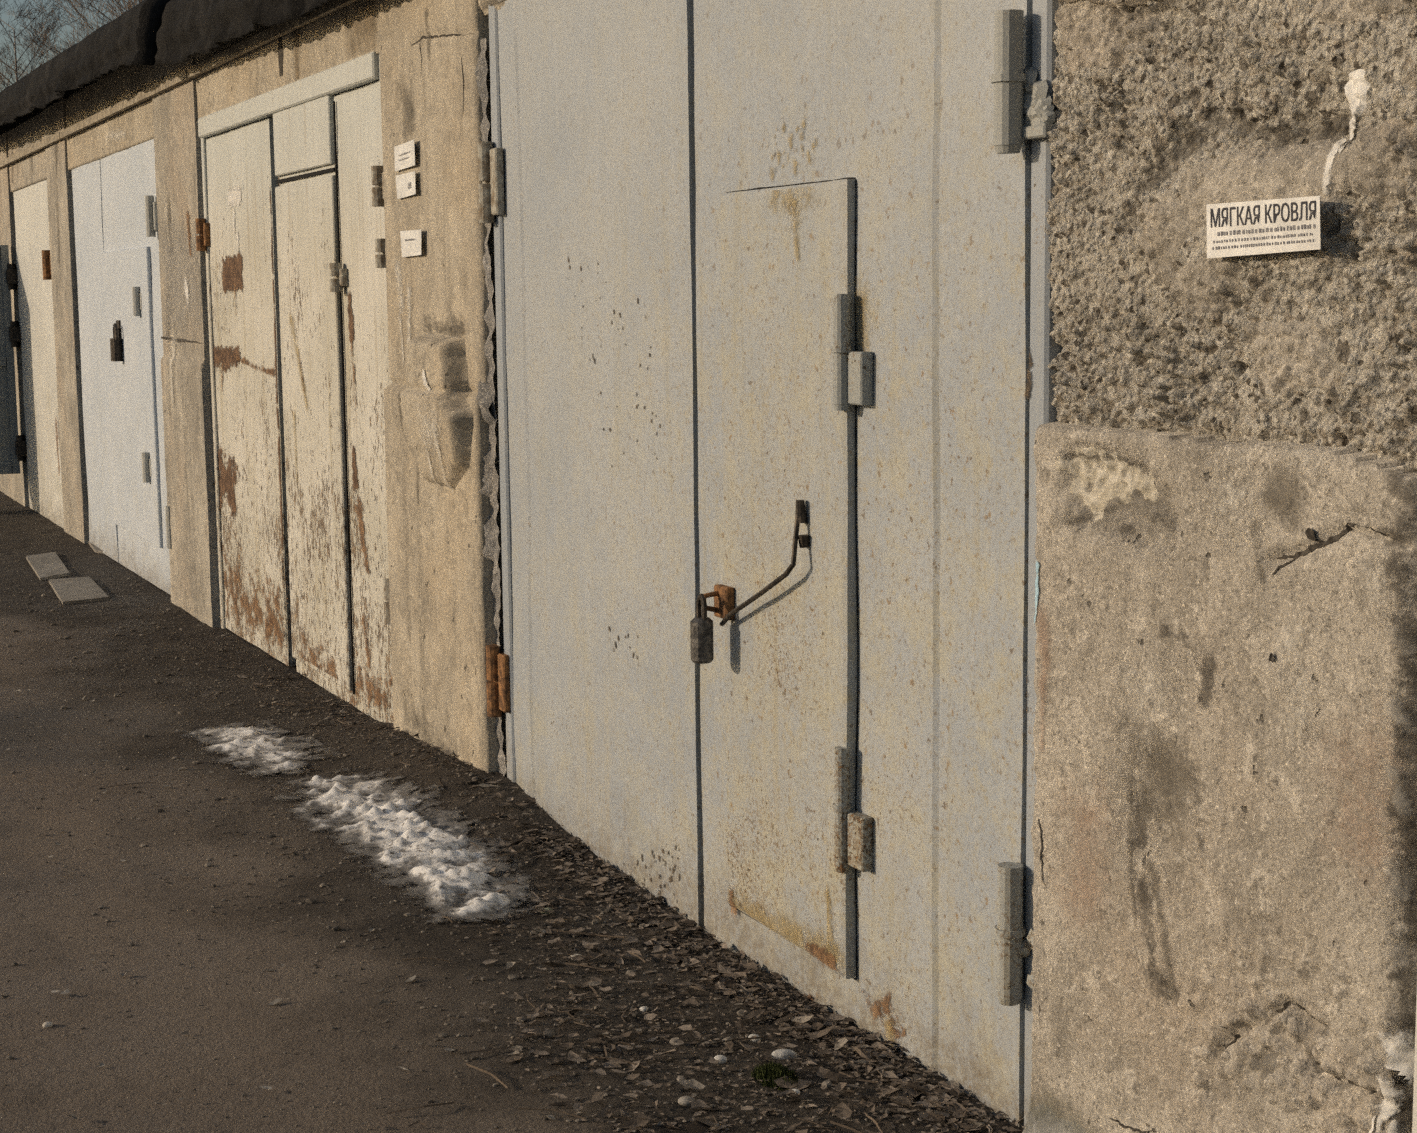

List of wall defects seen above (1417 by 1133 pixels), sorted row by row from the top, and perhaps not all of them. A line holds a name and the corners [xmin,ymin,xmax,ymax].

crack [411,33,474,94]
water stain [1129,95,1360,223]
peeling [221,252,243,309]
rust [213,176,307,563]
spalling [1025,0,1417,1048]
crack [1271,522,1408,577]
water stain [1126,735,1197,1000]
rust [728,889,838,971]
rust [862,991,906,1041]
crack [1220,995,1400,1133]
water stain [1369,1030,1415,1133]
spalling [1386,1076,1413,1128]